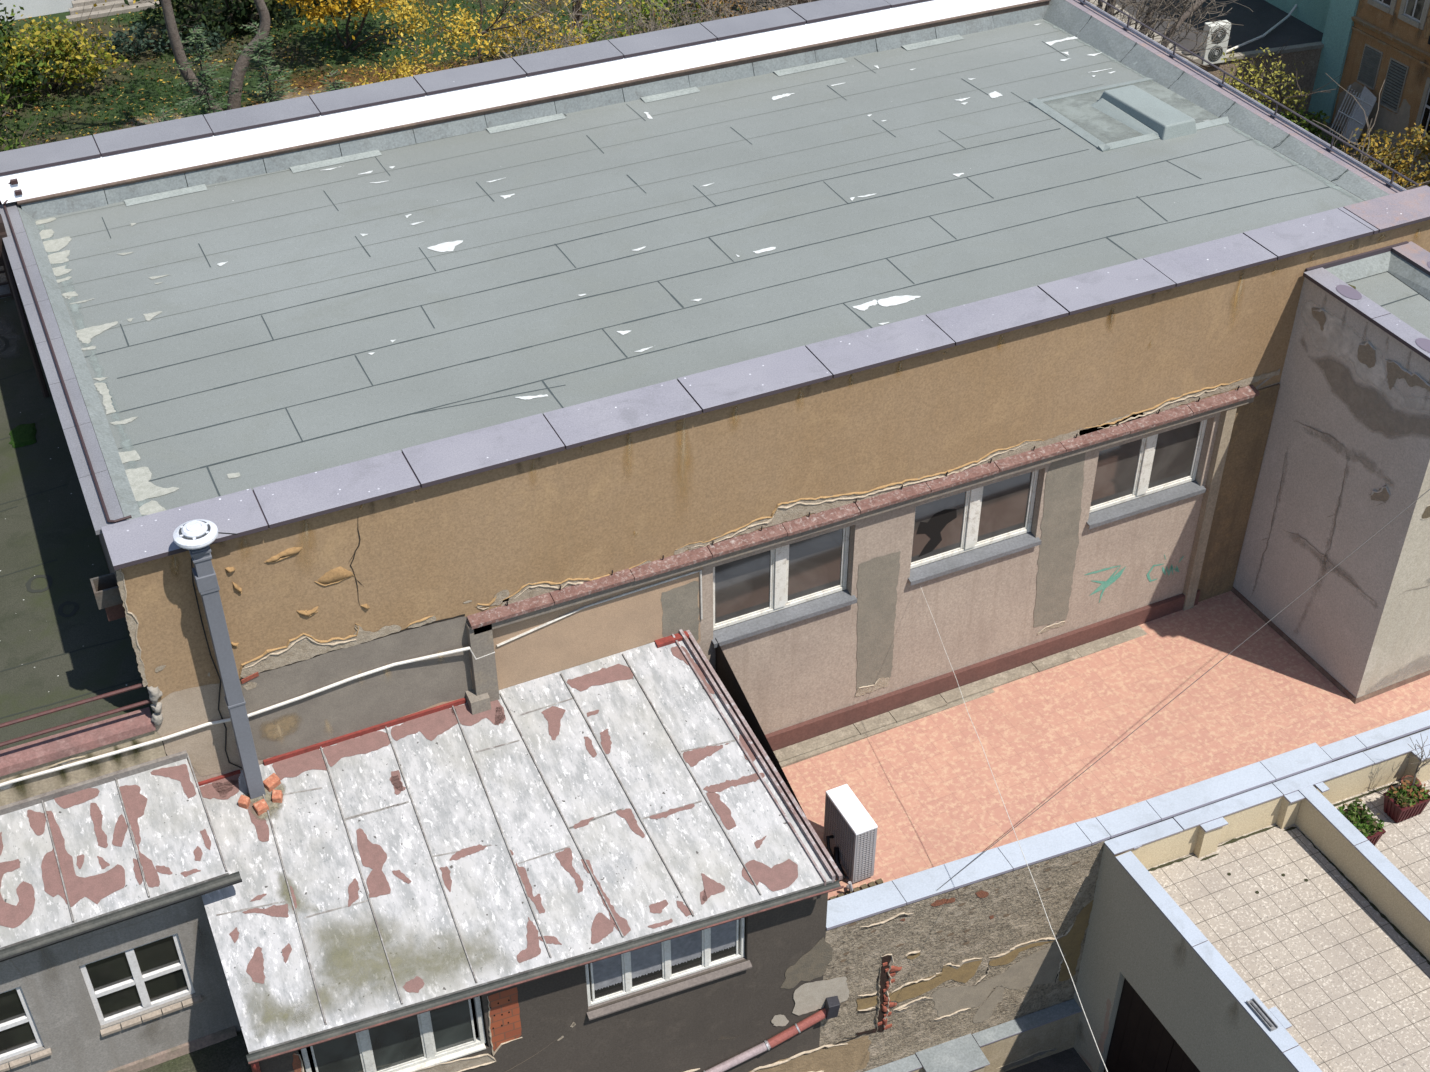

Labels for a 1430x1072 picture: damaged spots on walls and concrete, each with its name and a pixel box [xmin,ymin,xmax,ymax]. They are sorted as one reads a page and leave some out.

leakage [1317,358,1430,436]
spalling [674,370,1280,557]
crack [349,528,363,605]
spalling [115,569,166,726]
peeling [567,664,634,691]
peeling [272,700,506,780]
peeling [150,764,269,842]
peeling [0,785,211,928]
peeling [348,828,412,907]
peeling [510,850,562,963]
spalling [749,861,1094,1072]
flaking render [414,987,522,1072]